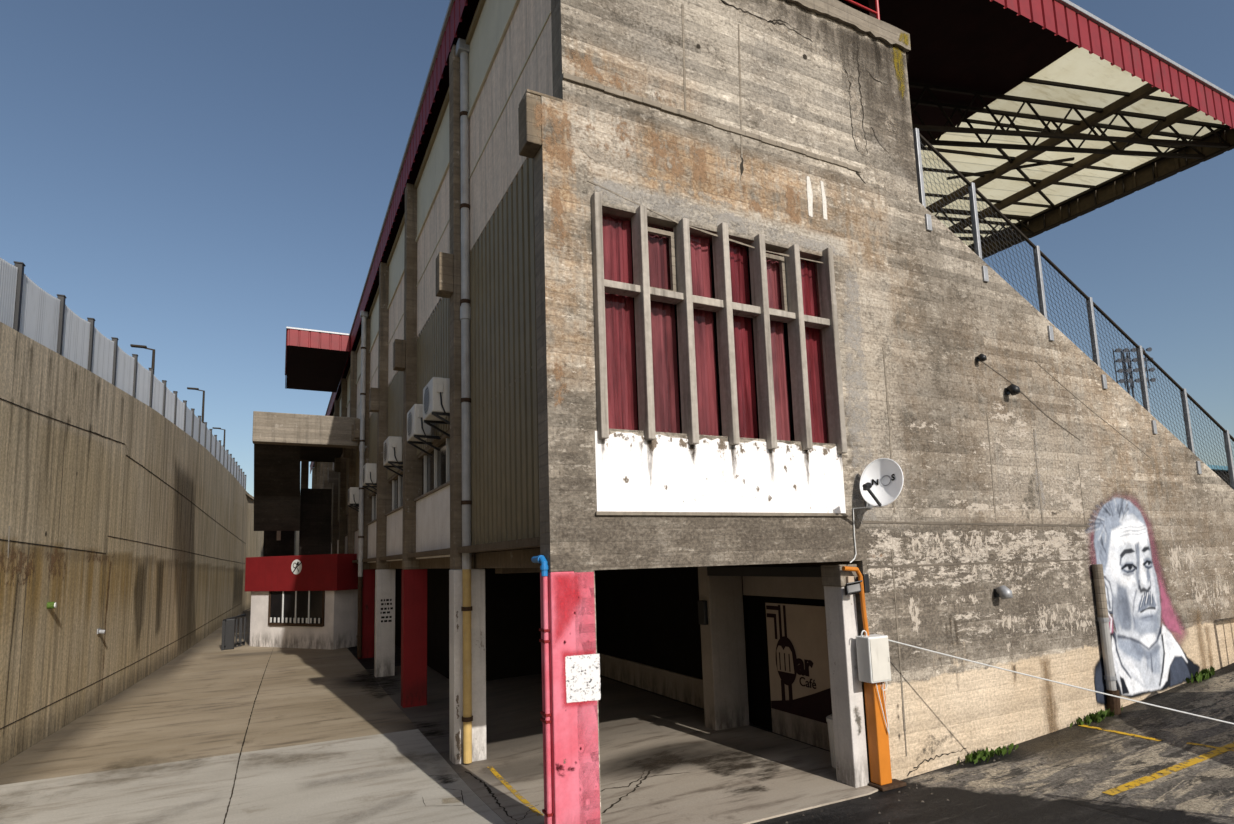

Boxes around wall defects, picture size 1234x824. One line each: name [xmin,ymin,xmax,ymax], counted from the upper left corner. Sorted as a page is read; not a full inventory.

crack [721,0,813,42]
crack [843,42,891,184]
peeling [988,401,1031,457]
peeling [609,431,838,489]
peeling [892,469,1088,520]
damp [135,471,195,643]
peeling [901,530,1094,652]